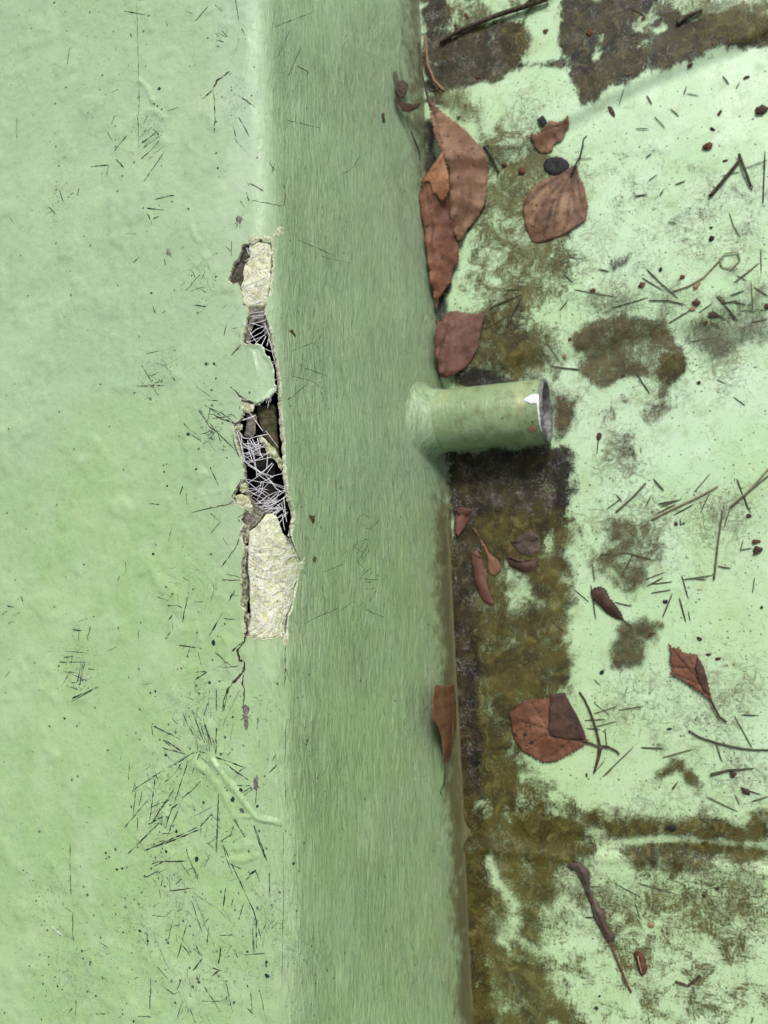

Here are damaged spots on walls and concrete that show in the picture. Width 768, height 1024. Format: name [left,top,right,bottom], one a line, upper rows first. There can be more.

leakage [443,0,550,41]
leakage [670,0,768,50]
spalling [226,226,306,646]
leakage [550,435,573,508]
crack [215,623,248,708]